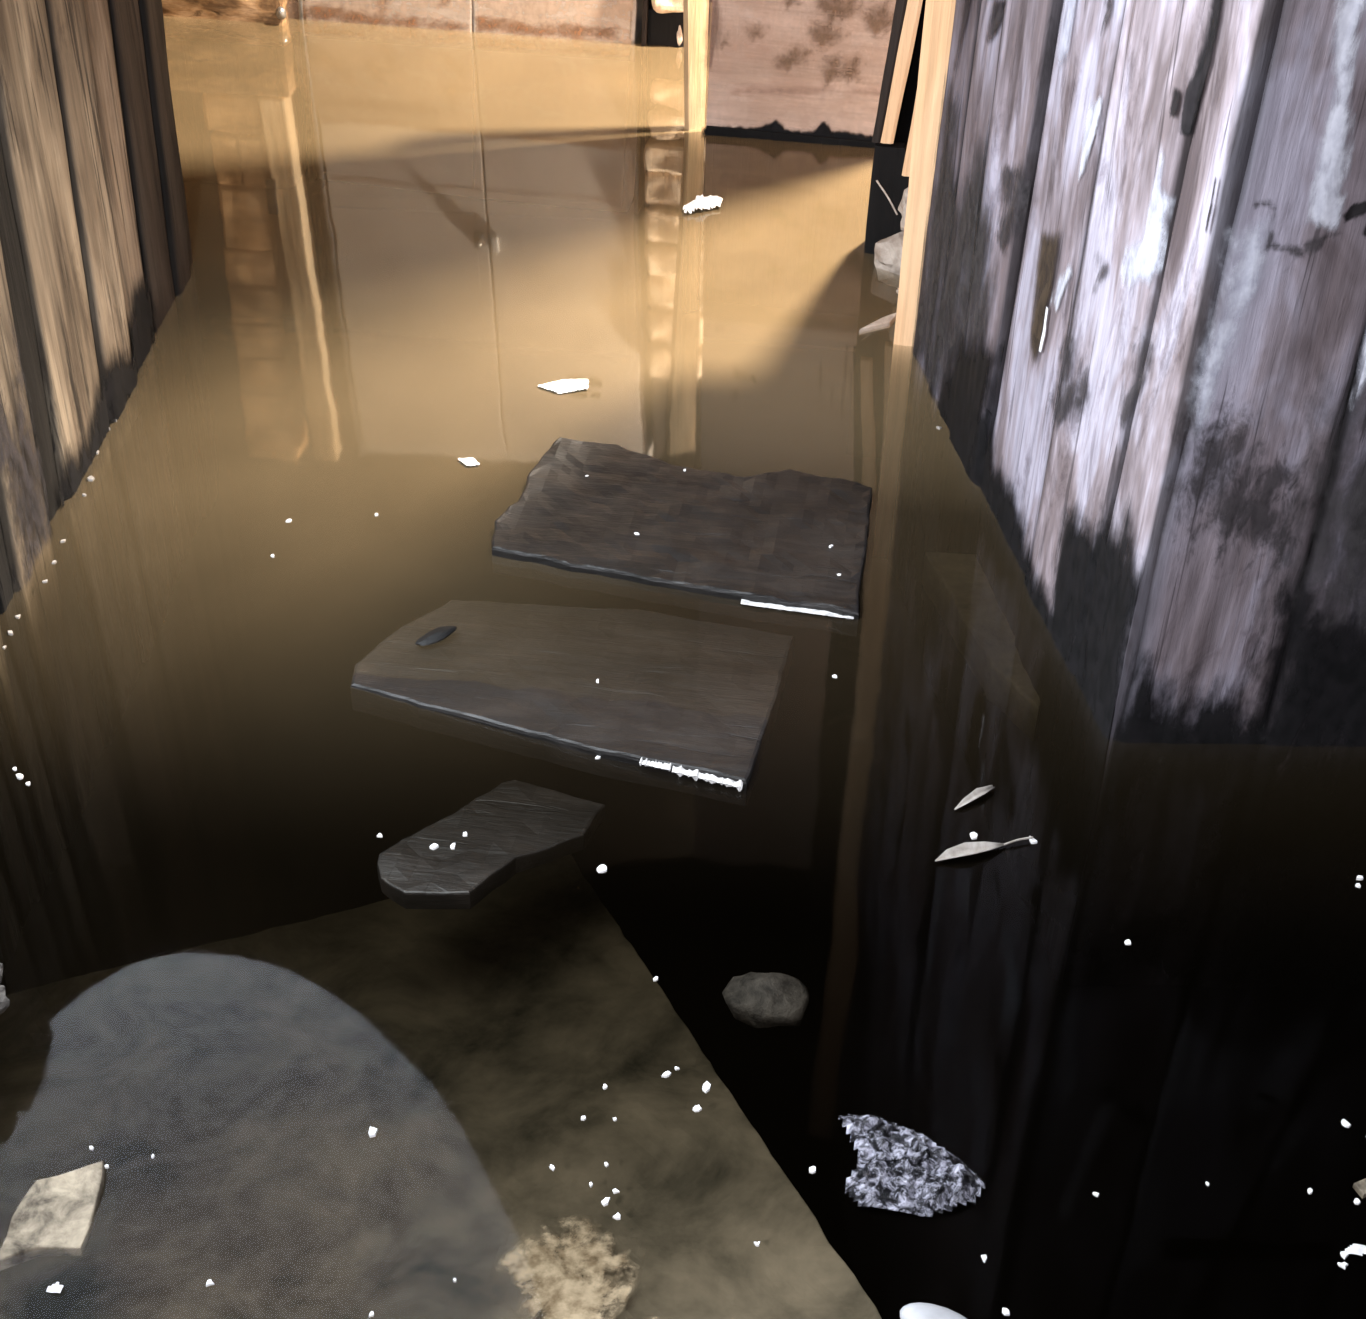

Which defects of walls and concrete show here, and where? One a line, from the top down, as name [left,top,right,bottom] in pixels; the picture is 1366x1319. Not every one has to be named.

leakage [782,0,852,65]
leakage [868,8,889,33]
leakage [955,0,970,64]
leakage [986,0,1005,40]
peeling [1351,339,1366,397]
leakage [912,80,1366,992]